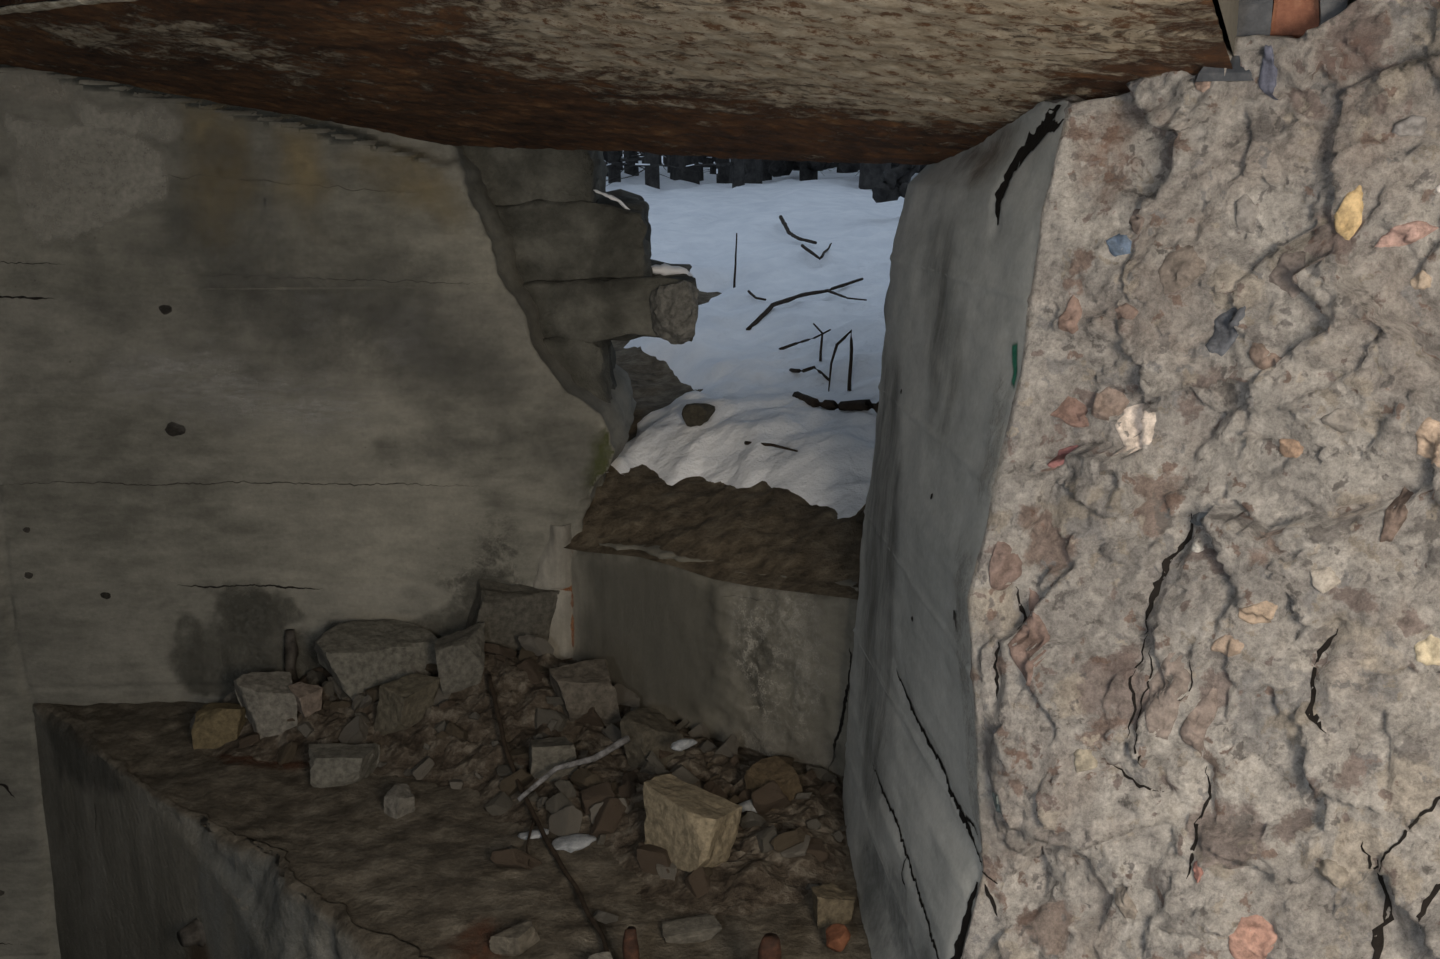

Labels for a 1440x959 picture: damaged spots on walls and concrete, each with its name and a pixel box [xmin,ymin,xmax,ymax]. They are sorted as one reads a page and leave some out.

crack [995,104,1064,225]
crack [0,261,62,300]
damp [174,587,333,696]
crack [828,648,852,771]
crack [1107,513,1193,792]
crack [1305,629,1338,733]
crack [873,668,998,959]
crack [1360,796,1440,959]